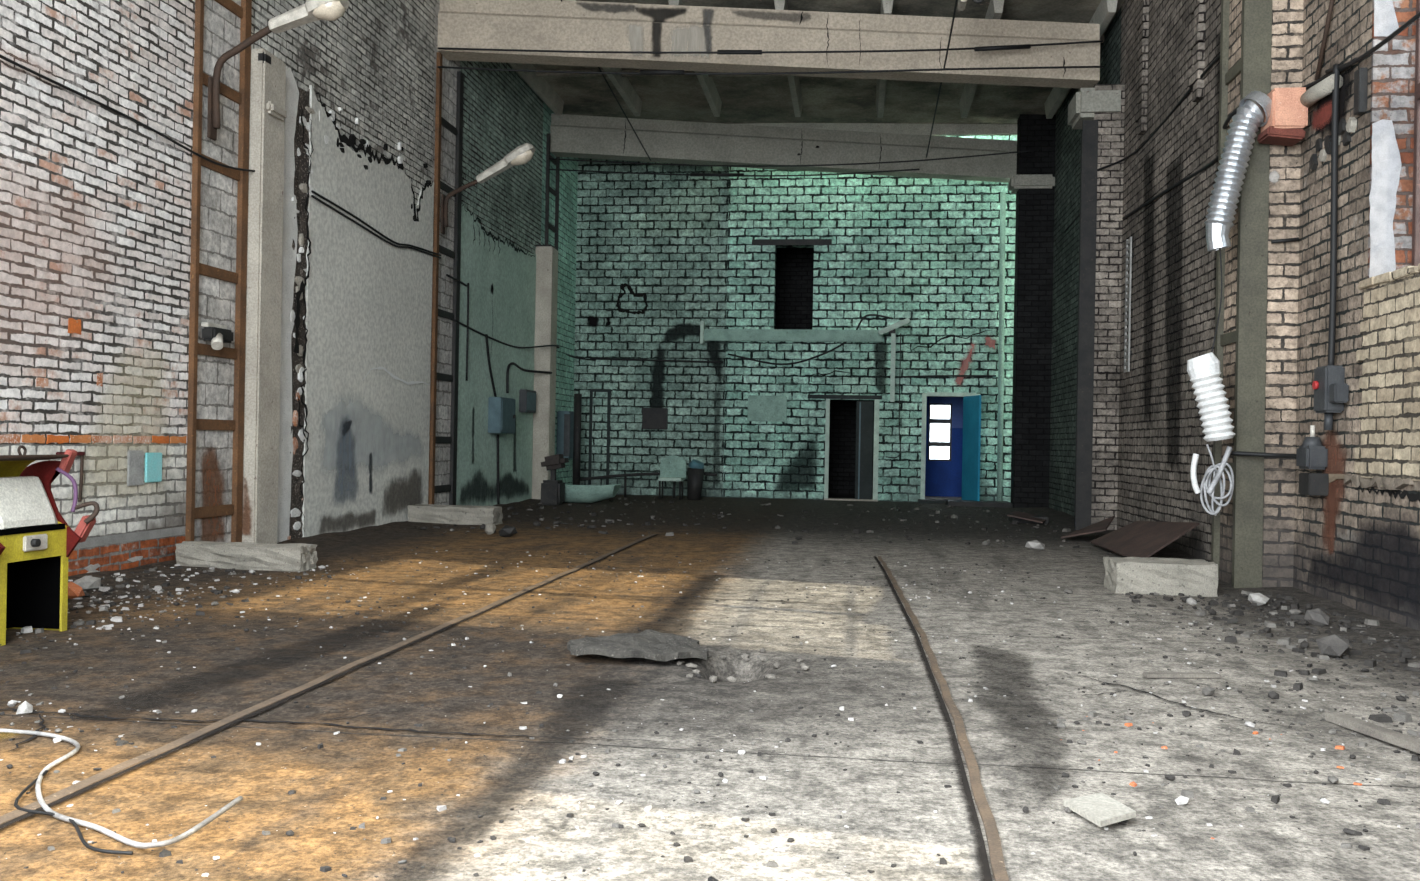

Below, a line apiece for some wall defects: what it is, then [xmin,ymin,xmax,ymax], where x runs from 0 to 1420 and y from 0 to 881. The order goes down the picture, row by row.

flaking render [277,68,433,543]
water stain [320,404,421,533]
water stain [1312,528,1420,605]